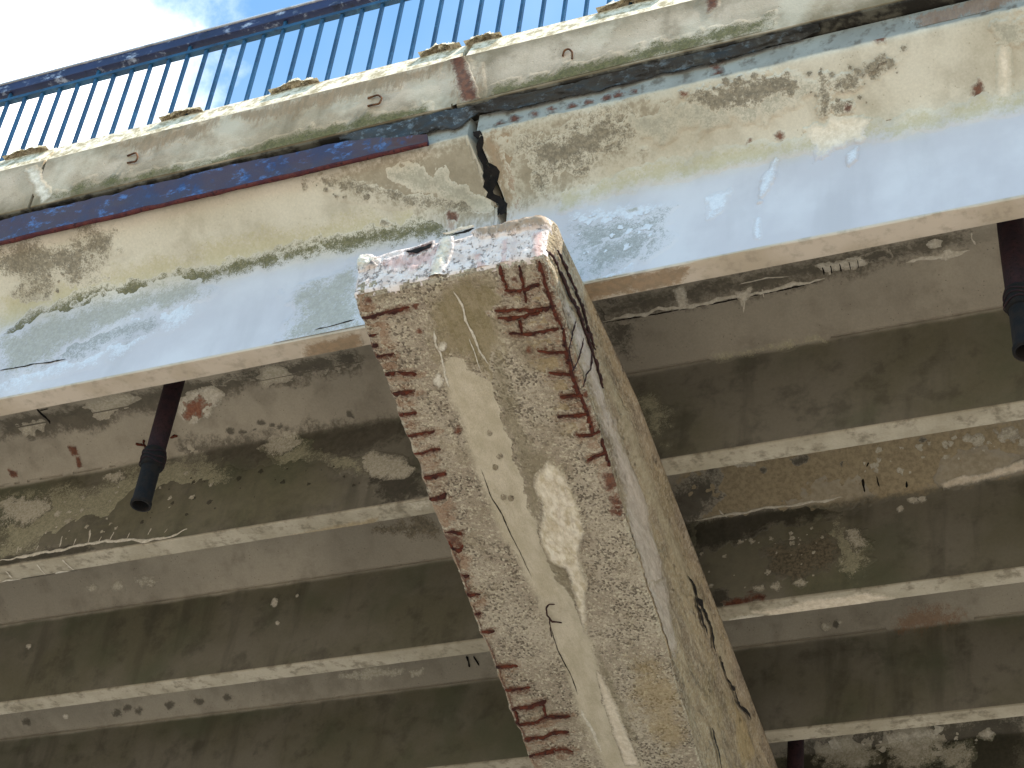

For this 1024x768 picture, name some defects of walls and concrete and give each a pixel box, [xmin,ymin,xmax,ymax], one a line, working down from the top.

corrosion [442,54,488,105]
damp [497,63,838,214]
spalling [377,240,438,274]
crack [604,276,825,323]
damp [0,137,693,768]
spalling [485,193,1024,686]
crack [0,529,186,566]
spalling [356,291,581,768]
damp [752,577,809,593]
crack [688,576,755,768]